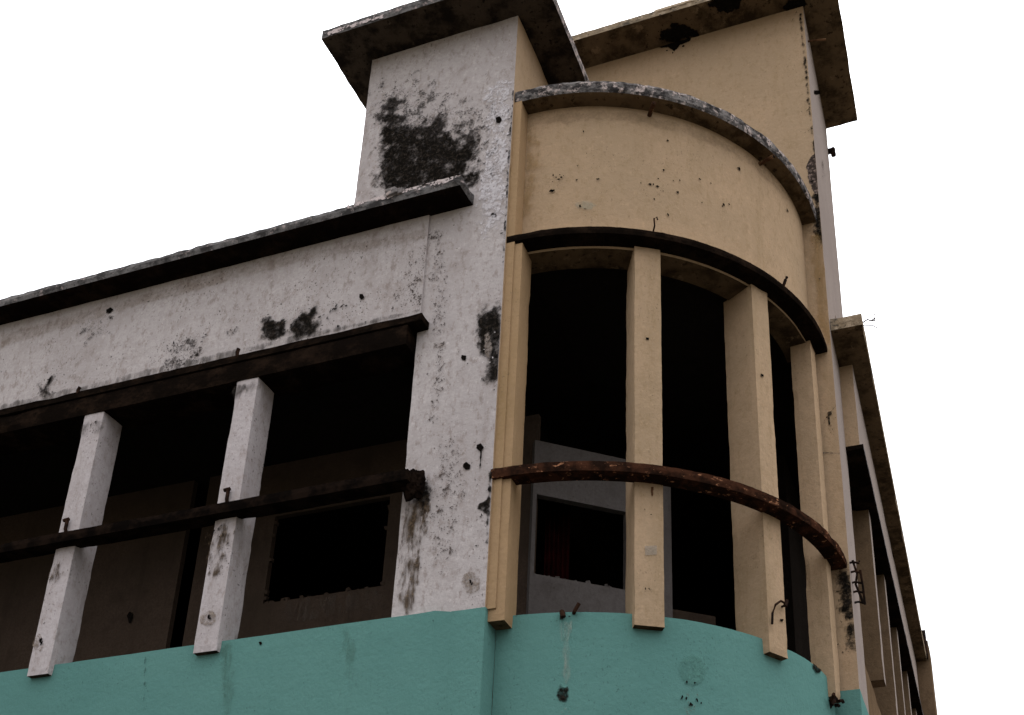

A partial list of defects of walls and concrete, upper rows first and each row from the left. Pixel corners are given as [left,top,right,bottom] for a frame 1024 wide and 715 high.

water stain [367,70,499,189]
water stain [812,194,822,244]
water stain [261,301,348,349]
water stain [476,306,501,390]
water stain [417,480,432,522]
water stain [836,569,855,653]